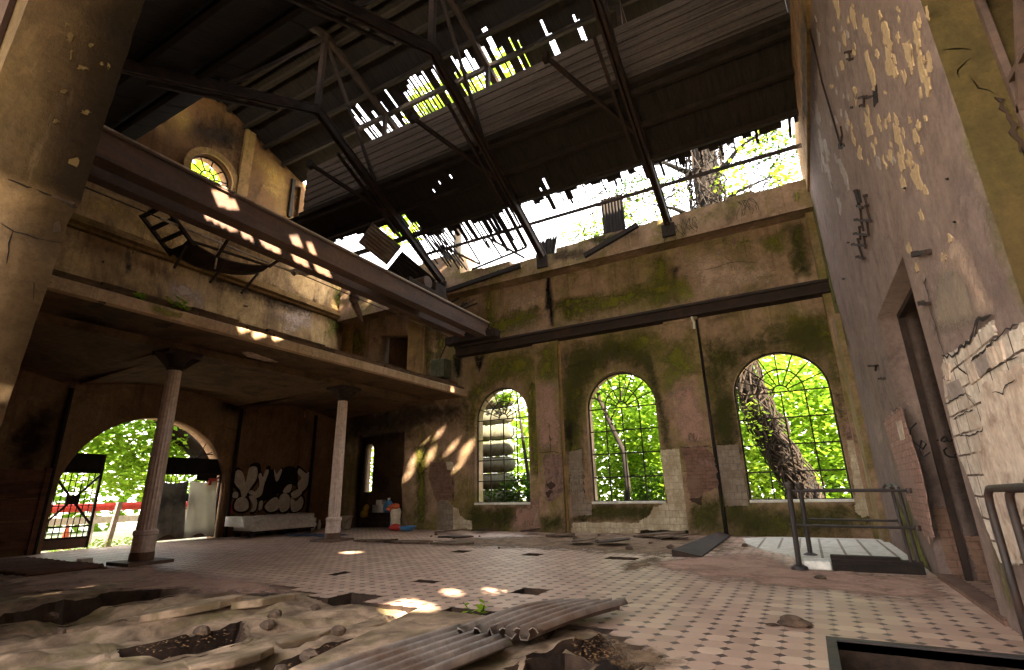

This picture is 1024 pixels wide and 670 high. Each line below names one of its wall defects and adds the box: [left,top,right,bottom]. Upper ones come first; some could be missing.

peeling [813,0,933,216]
crack [8,179,77,208]
crack [1,223,62,264]
damp [507,278,597,330]
damp [644,353,668,450]
damp [529,383,538,475]
spalling [428,460,454,503]
damp [468,505,527,530]
spalling [884,405,991,581]